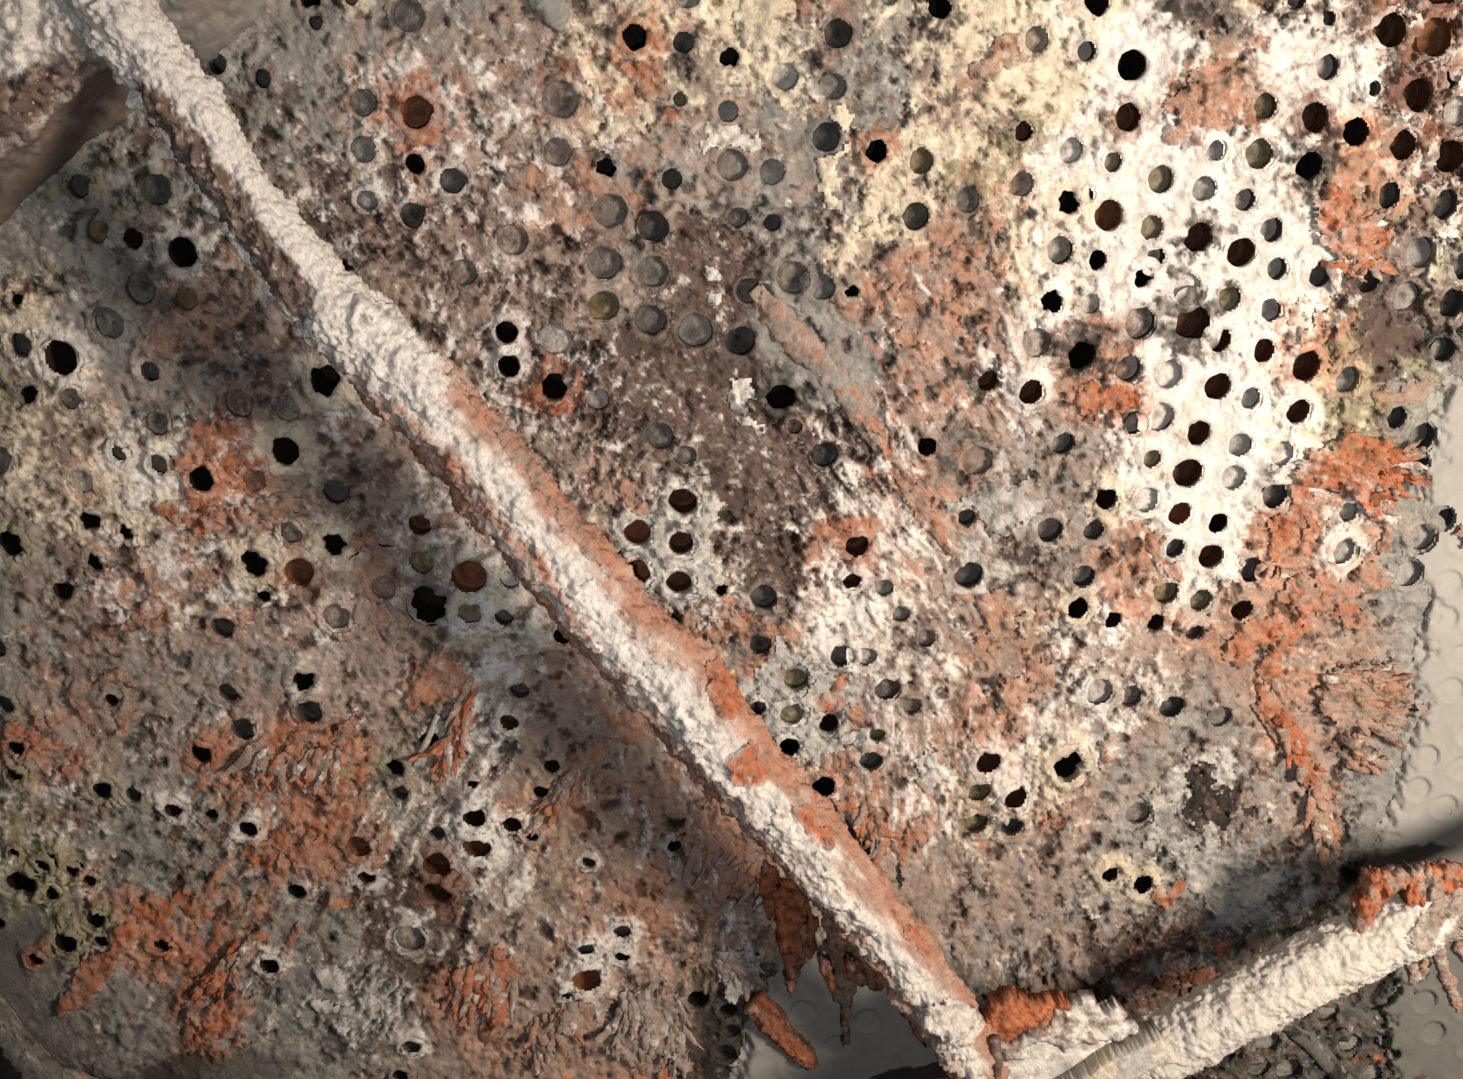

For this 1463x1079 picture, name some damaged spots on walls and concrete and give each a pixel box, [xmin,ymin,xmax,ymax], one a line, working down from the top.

damp [648,215,769,332]
corrosion [1282,179,1400,348]
damp [1328,394,1379,439]
damp [1389,354,1447,396]
corrosion [1222,423,1433,880]
corrosion [219,710,373,806]
corrosion [402,645,481,788]
corrosion [791,750,931,867]
damp [538,843,585,899]
corrosion [1348,857,1463,934]
corrosion [440,943,585,1078]
corrosion [983,985,1074,1043]